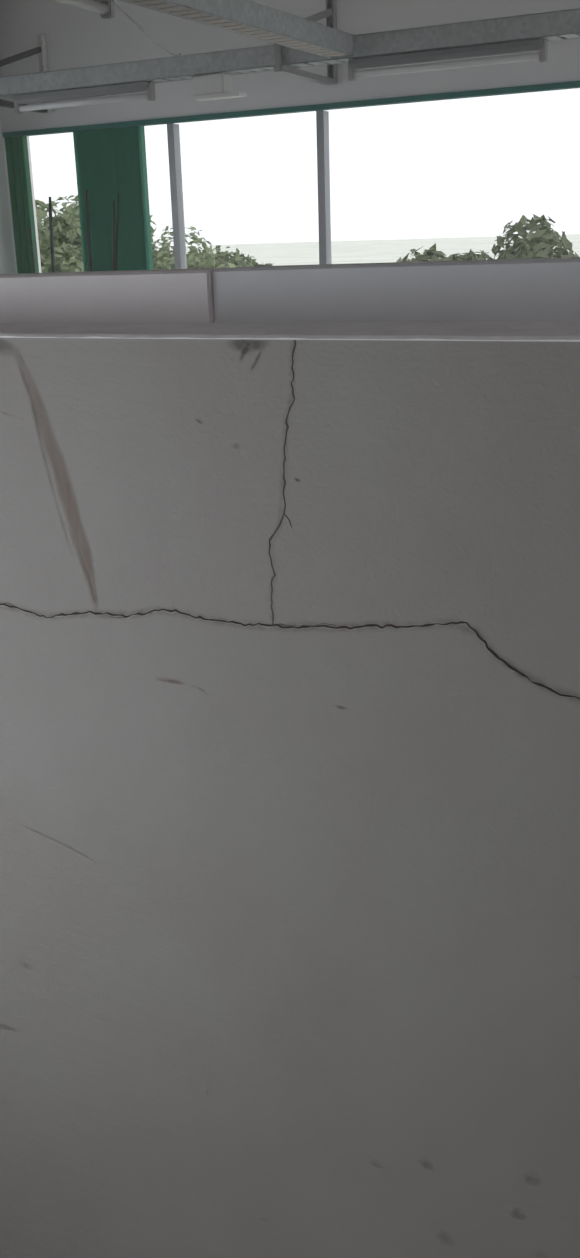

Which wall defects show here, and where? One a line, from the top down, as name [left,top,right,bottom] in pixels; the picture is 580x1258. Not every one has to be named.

crack [0,340,580,700]